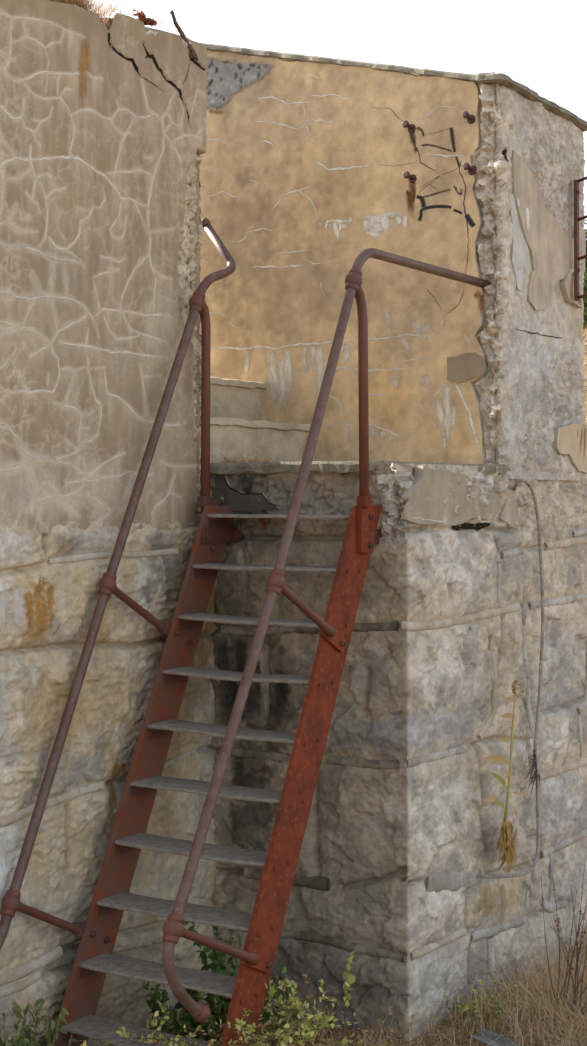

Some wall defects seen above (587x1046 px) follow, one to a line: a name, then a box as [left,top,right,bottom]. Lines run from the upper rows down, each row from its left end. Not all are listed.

rust [26,578,54,630]
crack [0,12,227,521]
spalling [177,151,282,515]
crack [223,475,280,507]
crack [204,46,482,457]
rust [406,183,416,209]
peeling [371,466,523,548]
spalling [471,69,587,474]